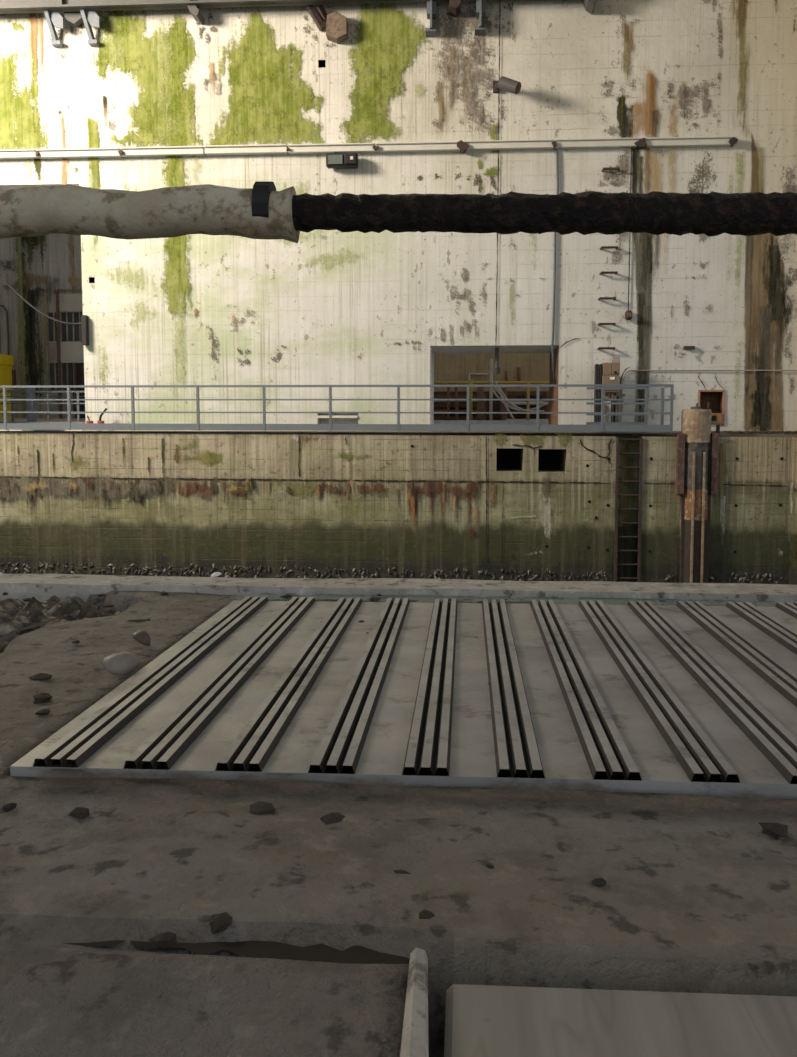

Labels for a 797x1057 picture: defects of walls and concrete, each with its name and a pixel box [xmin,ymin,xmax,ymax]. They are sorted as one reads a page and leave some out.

corrosion [29,13,43,71]
corrosion [621,22,634,78]
corrosion [632,70,675,194]
corrosion [315,480,499,536]
crack [63,940,410,964]